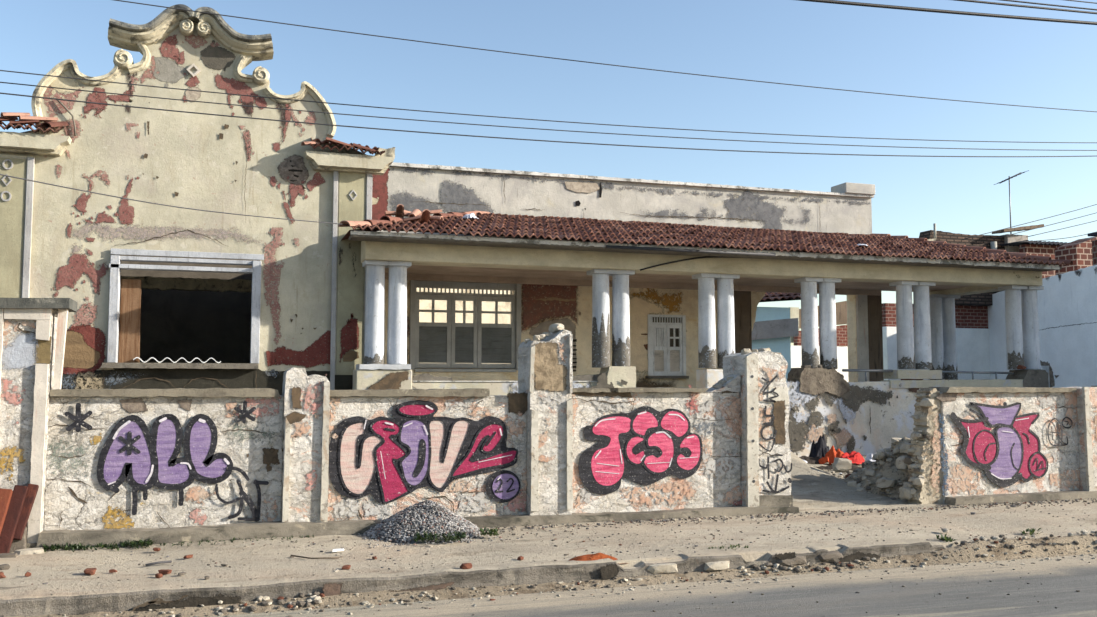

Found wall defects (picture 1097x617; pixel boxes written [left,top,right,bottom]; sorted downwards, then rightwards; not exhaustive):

flaking render [372,168,443,225]
peeling [43,34,409,440]
flaking render [3,170,159,387]
peeling [445,284,664,464]
peeling [802,348,838,369]
peeling [898,355,958,380]
peeling [1028,360,1078,428]
peeling [0,444,31,483]
peeling [328,493,390,521]
peeling [446,468,527,513]
peeling [685,366,919,506]
peeling [925,393,985,495]